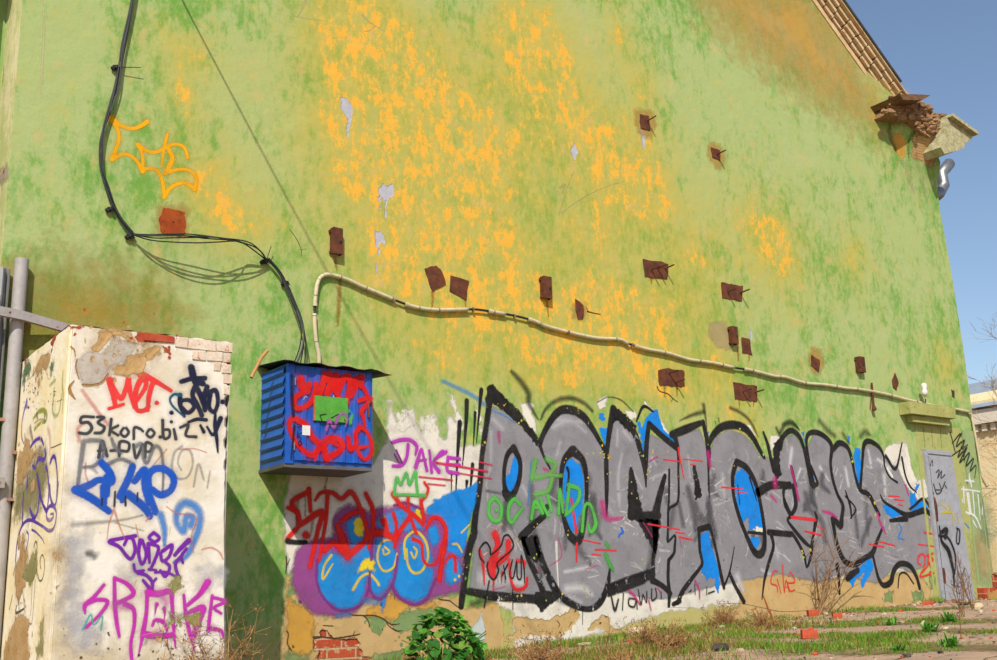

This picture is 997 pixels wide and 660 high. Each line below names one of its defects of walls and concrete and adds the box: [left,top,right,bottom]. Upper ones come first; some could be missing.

spalling [25,322,178,405]
spalling [15,434,41,493]
spalling [3,534,44,660]
peeling [168,575,184,593]
peeling [170,613,202,629]
spalling [271,574,580,660]
spalling [588,614,619,634]